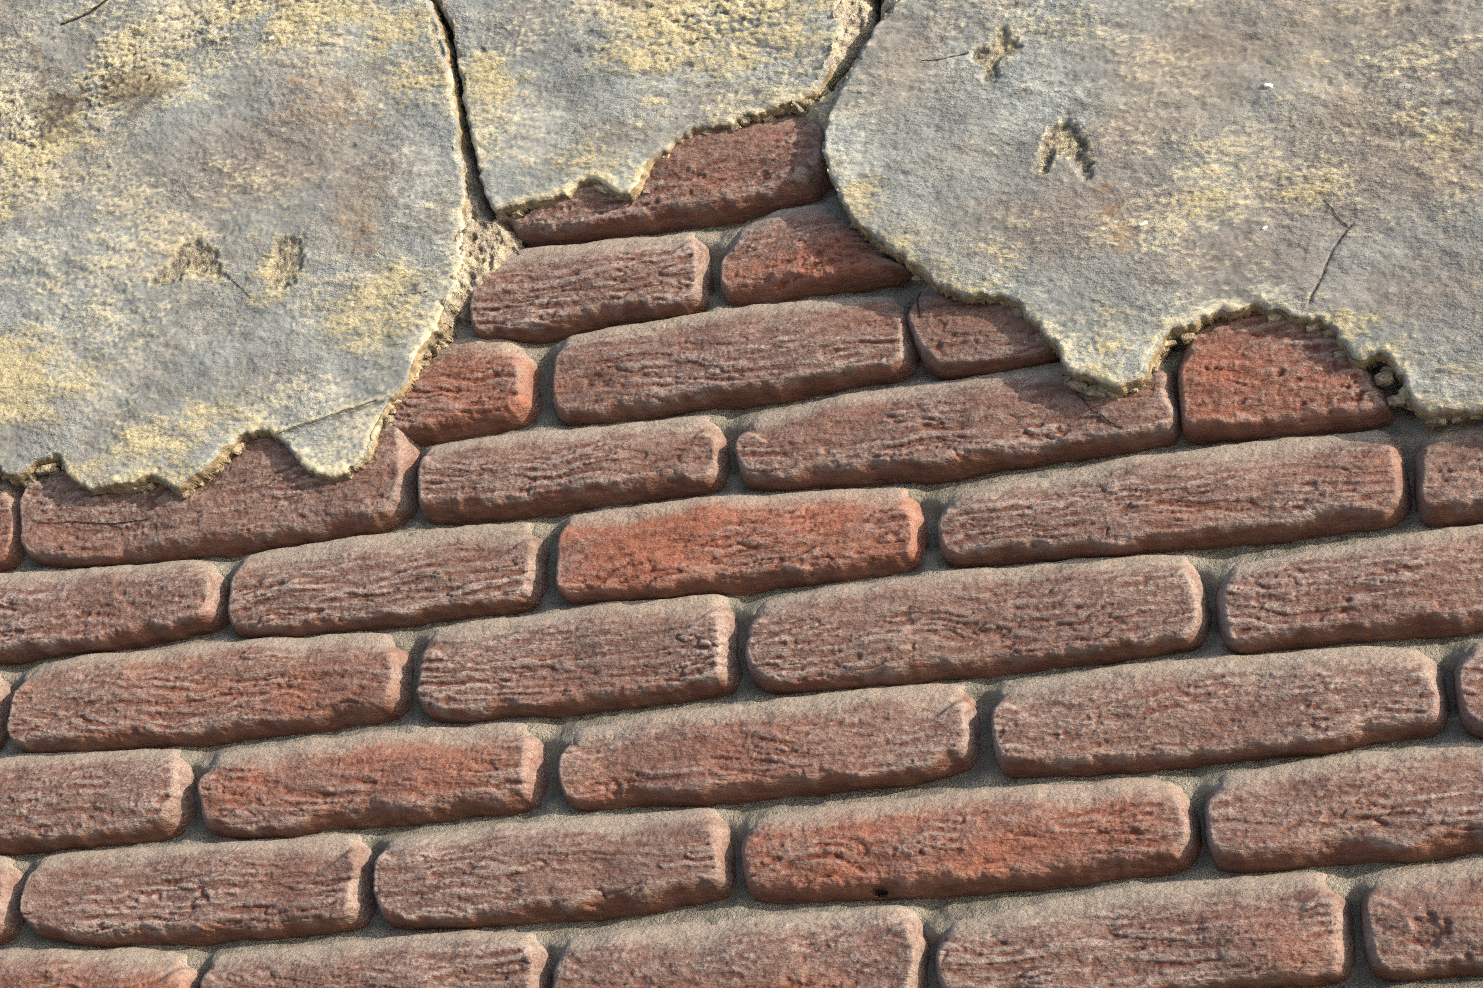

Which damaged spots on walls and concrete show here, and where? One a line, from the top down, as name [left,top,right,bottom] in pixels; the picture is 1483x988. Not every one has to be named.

crack [60,0,107,25]
crack [378,0,524,329]
spalling [658,86,832,158]
crack [791,0,898,192]
spalling [1035,124,1091,176]
spalling [152,244,222,285]
spalling [270,236,302,287]
crack [1309,202,1352,303]
spalling [117,266,471,500]
spalling [1035,306,1483,432]
spalling [0,457,99,495]
spalling [1414,916,1446,950]